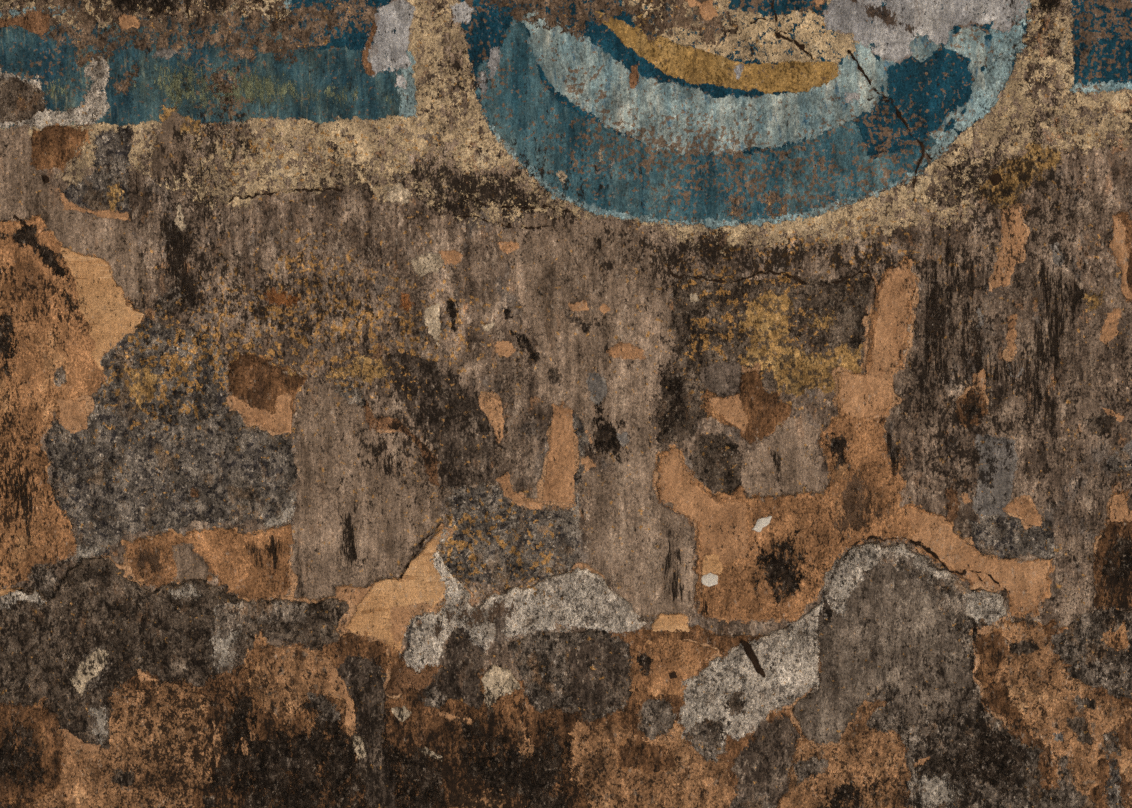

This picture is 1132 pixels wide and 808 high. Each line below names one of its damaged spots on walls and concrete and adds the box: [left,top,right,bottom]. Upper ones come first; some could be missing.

damp [0,0,381,67]
crack [744,0,814,60]
crack [847,50,952,200]
spalling [1083,209,1132,347]
spalling [1083,408,1125,439]
flaking render [0,215,473,759]
spalling [606,250,1062,808]
spalling [1093,488,1132,610]
flaking render [112,768,135,787]
flaking render [212,720,222,767]
flaking render [481,664,534,758]
flaking render [1053,694,1132,806]